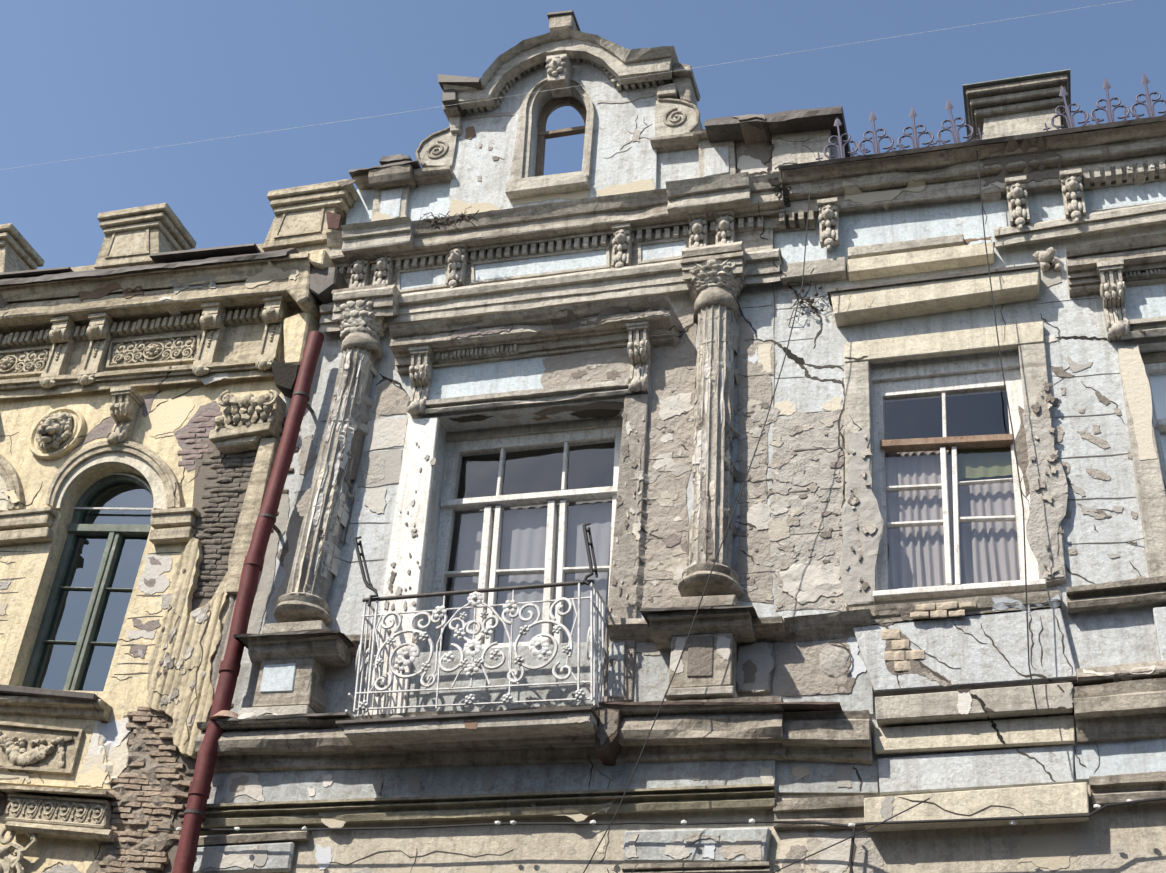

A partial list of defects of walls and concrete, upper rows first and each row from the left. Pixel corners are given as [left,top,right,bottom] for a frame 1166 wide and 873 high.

crack [609,115,652,158]
flaking render [128,394,257,677]
spalling [328,352,436,514]
spalling [541,279,976,715]
crack [734,119,868,543]
spalling [1013,355,1138,579]
crack [1040,313,1124,423]
peeling [1095,347,1158,460]
crack [877,614,1074,782]
flaking render [42,706,196,873]
crack [332,849,514,872]
crack [895,796,1023,816]